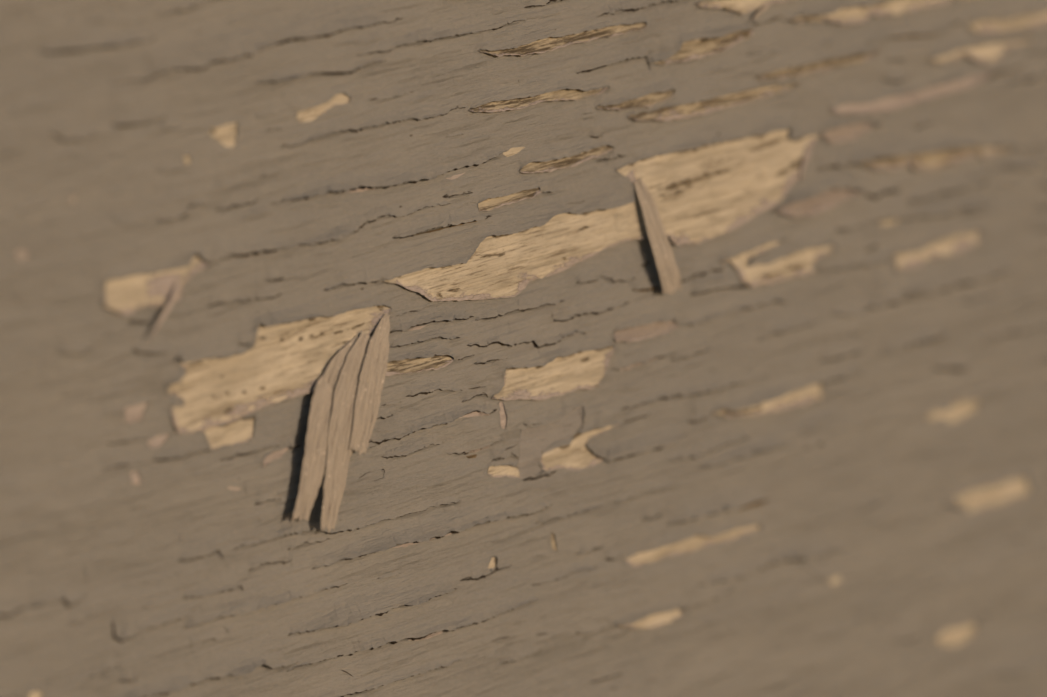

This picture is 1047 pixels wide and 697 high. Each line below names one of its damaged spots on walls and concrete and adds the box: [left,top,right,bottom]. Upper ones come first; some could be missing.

peeling [88,225,290,341]
peeling [141,0,1039,533]
peeling [618,507,769,570]